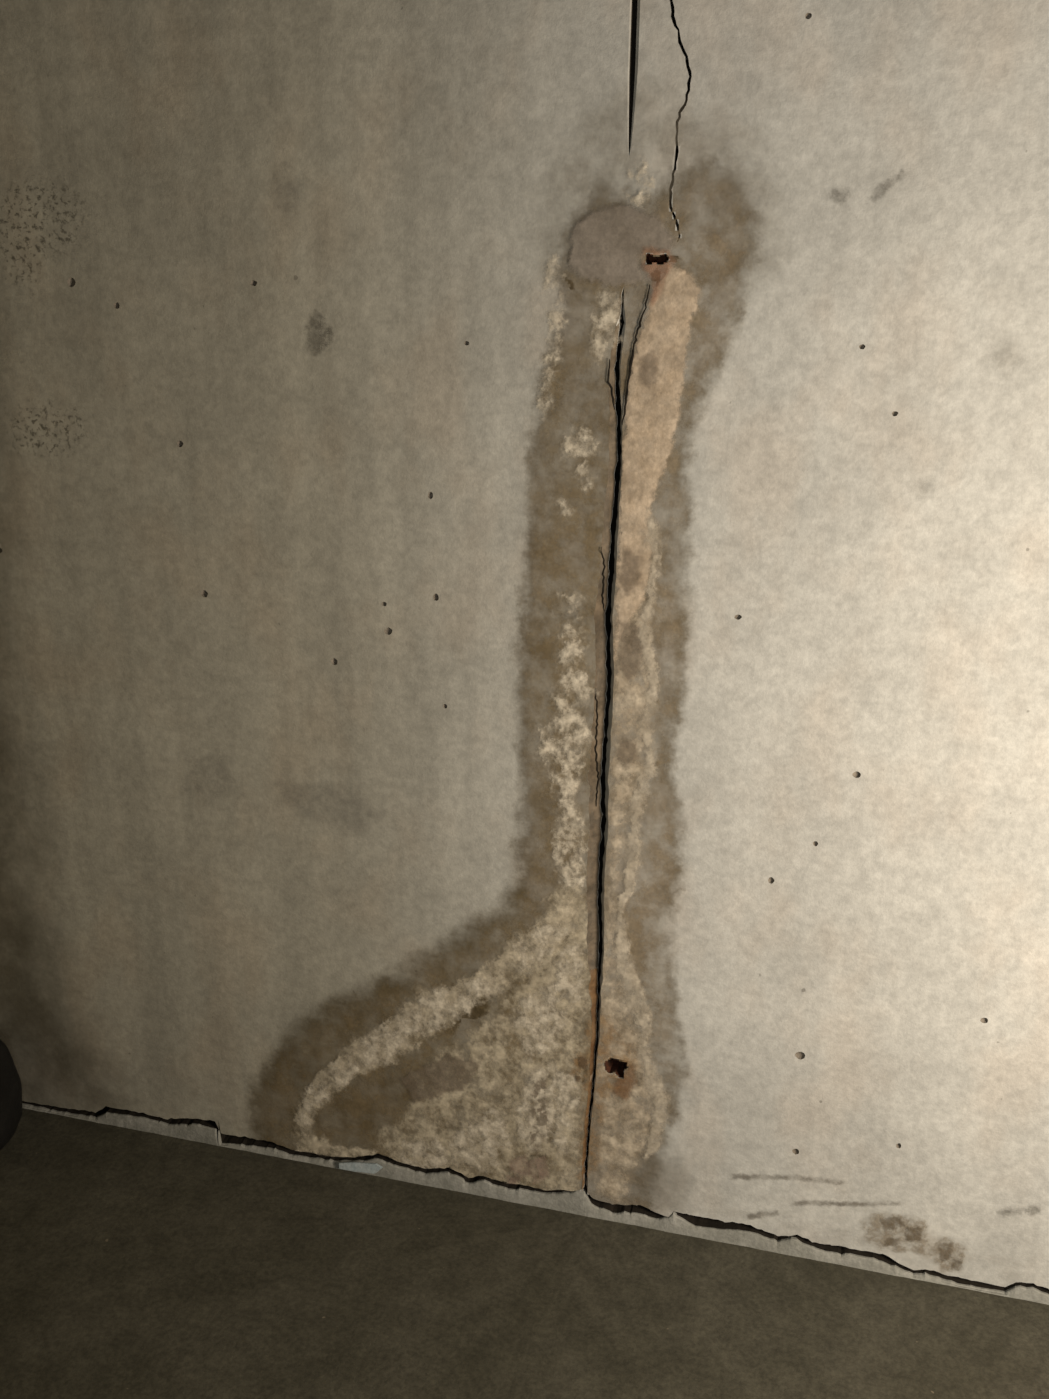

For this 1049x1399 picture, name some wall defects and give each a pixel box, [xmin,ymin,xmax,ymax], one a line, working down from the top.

crack [669,0,692,238]
leakage [252,176,752,1209]
crack [22,285,1049,1294]